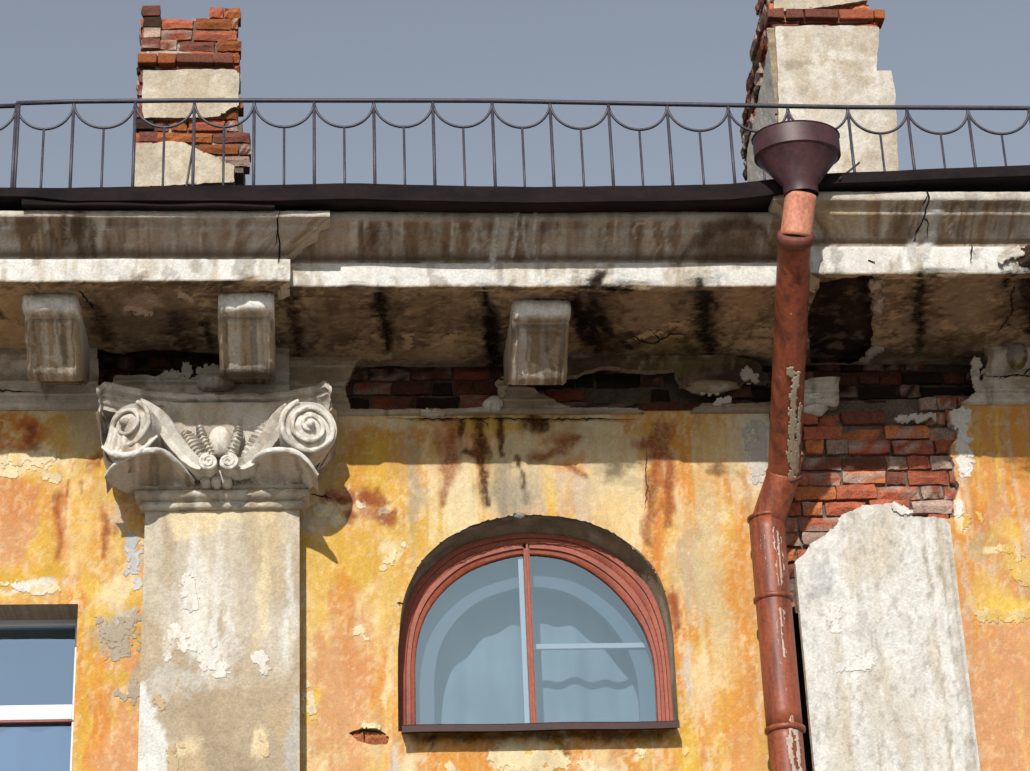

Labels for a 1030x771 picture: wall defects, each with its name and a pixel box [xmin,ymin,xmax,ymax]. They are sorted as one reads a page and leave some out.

crack [274,211,282,262]
crack [912,191,930,245]
leakage [482,287,502,366]
leakage [571,270,634,351]
leakage [650,278,718,356]
spalling [345,331,509,419]
crack [987,369,1030,380]
leakage [458,417,525,506]
spalling [760,260,985,664]
peeling [163,623,231,678]
spalling [351,720,389,745]
peeling [487,742,610,771]